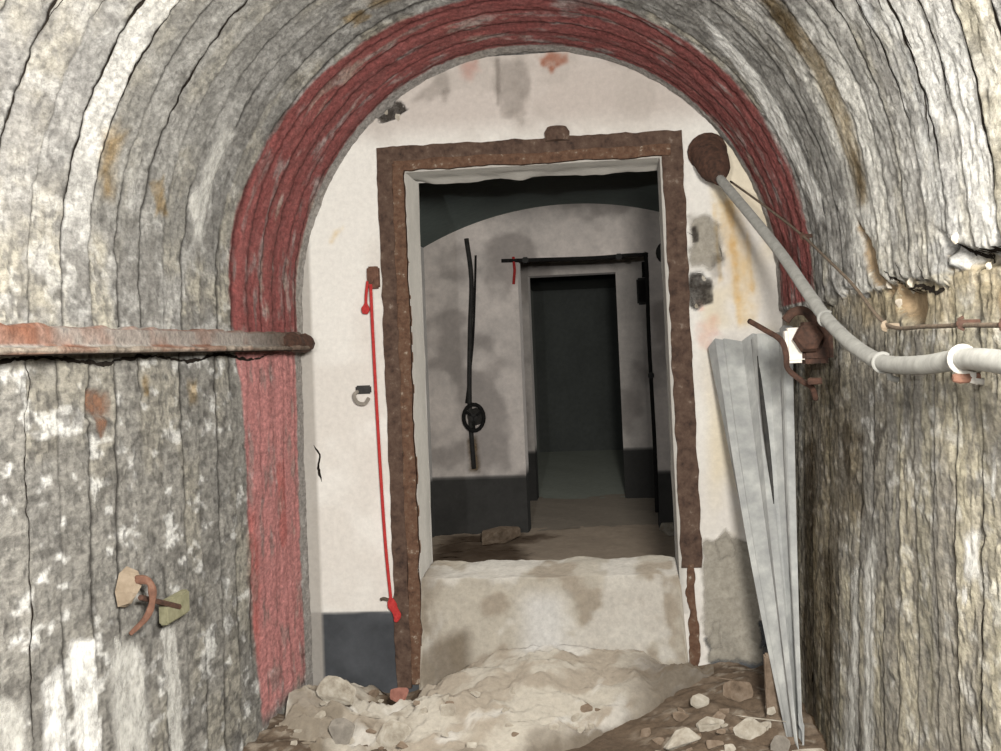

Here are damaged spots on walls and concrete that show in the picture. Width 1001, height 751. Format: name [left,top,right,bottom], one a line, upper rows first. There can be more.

crack [991,0,1001,35]
flaking render [689,216,723,310]
spalling [858,223,928,322]
crack [960,244,1001,263]
flaking render [703,532,768,669]